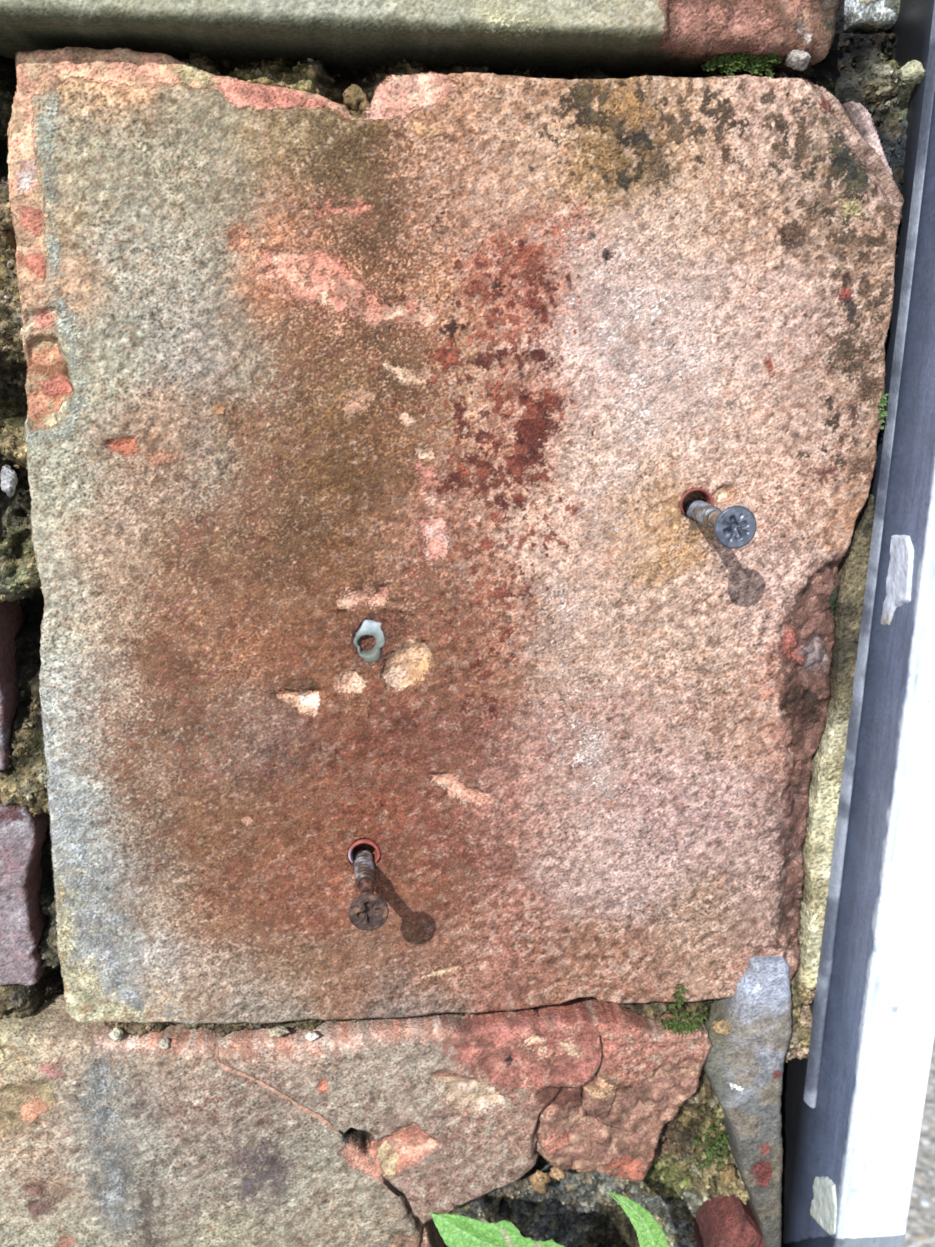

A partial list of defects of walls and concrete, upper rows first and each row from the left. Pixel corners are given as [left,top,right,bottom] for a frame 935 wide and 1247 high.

spalling [657,0,904,216]
damp [538,75,902,364]
damp [797,397,878,484]
corrosion [61,116,541,1013]
crack [215,1045,343,1136]
spalling [88,999,705,1184]
crack [381,1175,424,1247]